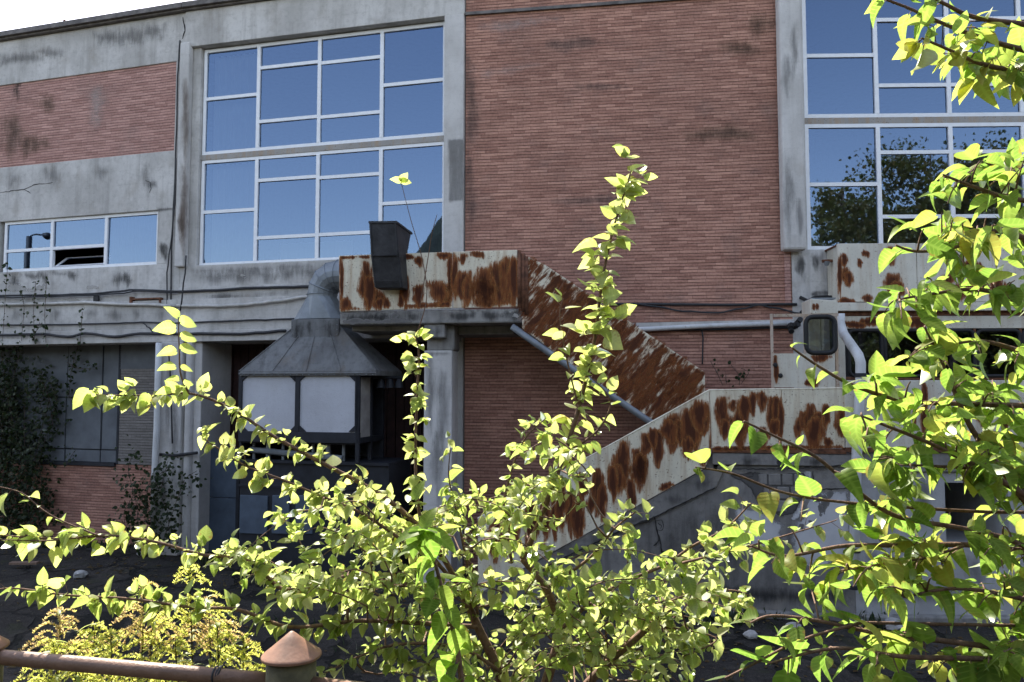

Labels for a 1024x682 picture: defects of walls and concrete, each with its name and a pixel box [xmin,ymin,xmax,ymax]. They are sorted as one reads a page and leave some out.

rust [837,249,873,303]
rust [883,246,905,296]
rust [339,251,845,564]